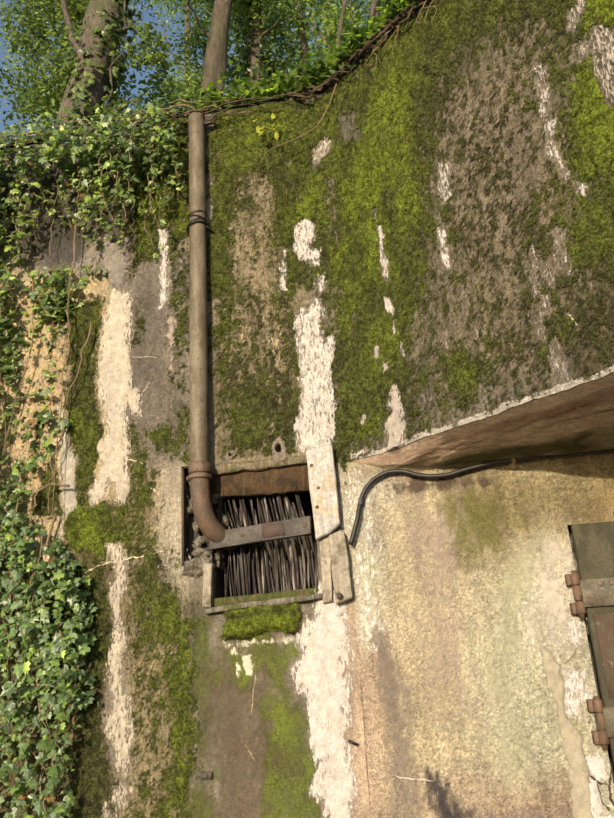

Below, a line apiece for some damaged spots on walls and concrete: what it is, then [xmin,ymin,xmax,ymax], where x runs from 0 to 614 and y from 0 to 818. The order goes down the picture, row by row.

spalling [568,0,585,29]
spalling [577,25,614,107]
leakage [438,162,453,203]
leakage [279,218,337,453]
leakage [350,223,614,459]
leakage [393,477,489,495]
leakage [223,471,389,818]
peeling [567,617,585,649]
peeling [563,668,593,722]
leakage [426,770,472,818]